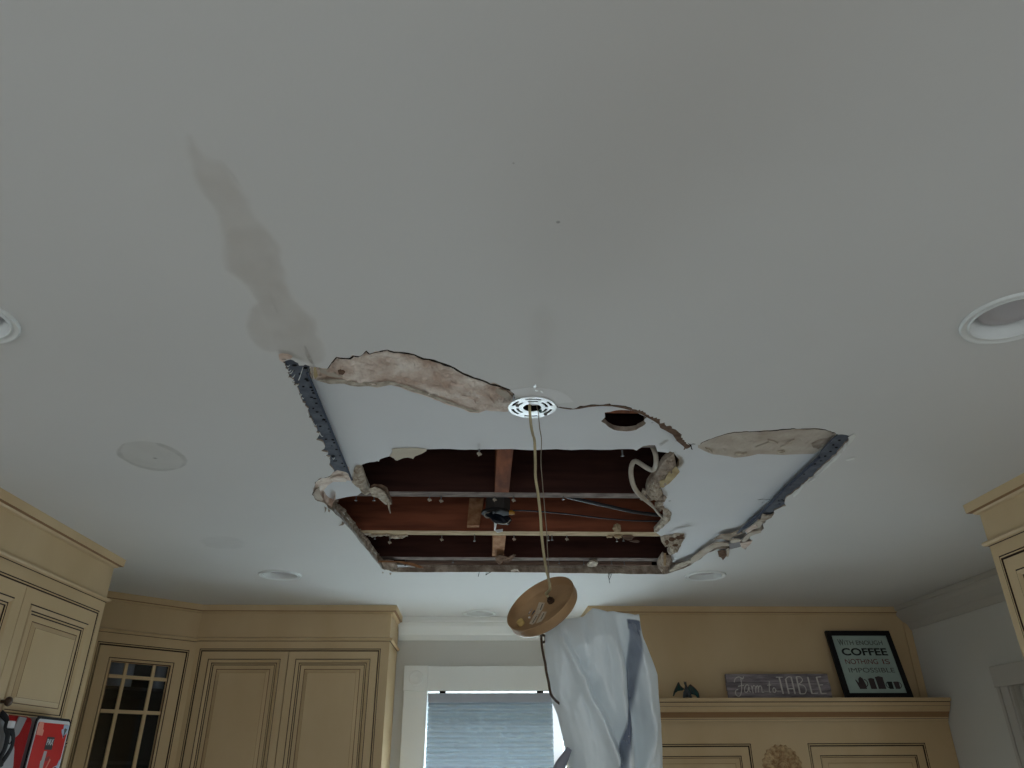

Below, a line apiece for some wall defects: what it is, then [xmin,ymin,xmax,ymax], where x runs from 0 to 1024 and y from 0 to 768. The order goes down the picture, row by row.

flaking render [309,350,515,413]
crack [557,403,693,450]
flaking render [698,428,836,458]
flaking render [313,466,351,507]